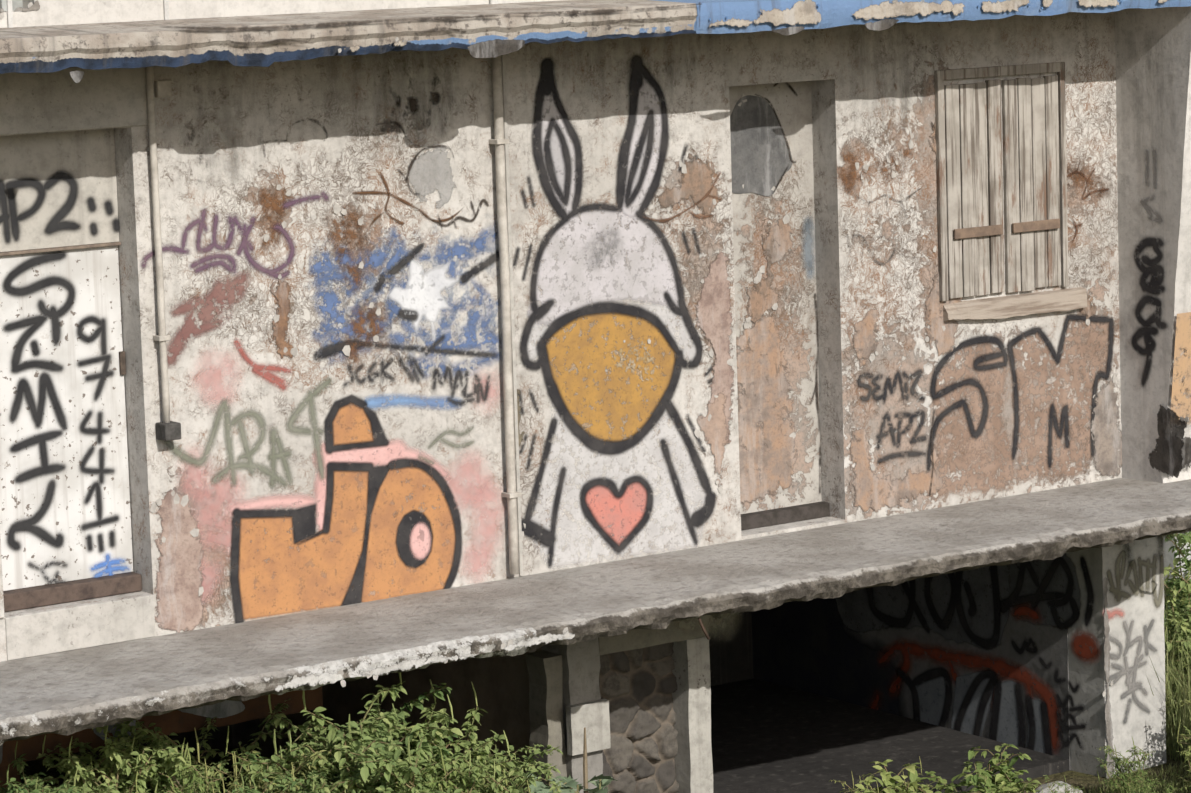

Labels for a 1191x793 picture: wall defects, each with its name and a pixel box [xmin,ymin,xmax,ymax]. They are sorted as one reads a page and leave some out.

peeling [709,0,821,36]
peeling [852,0,1053,31]
peeling [1078,0,1123,8]
spalling [652,94,792,218]
peeling [923,233,963,360]
peeling [1079,295,1098,326]
peeling [851,309,884,367]
peeling [848,427,943,512]
peeling [501,627,575,651]
peeling [275,670,346,692]
peeling [362,655,474,680]